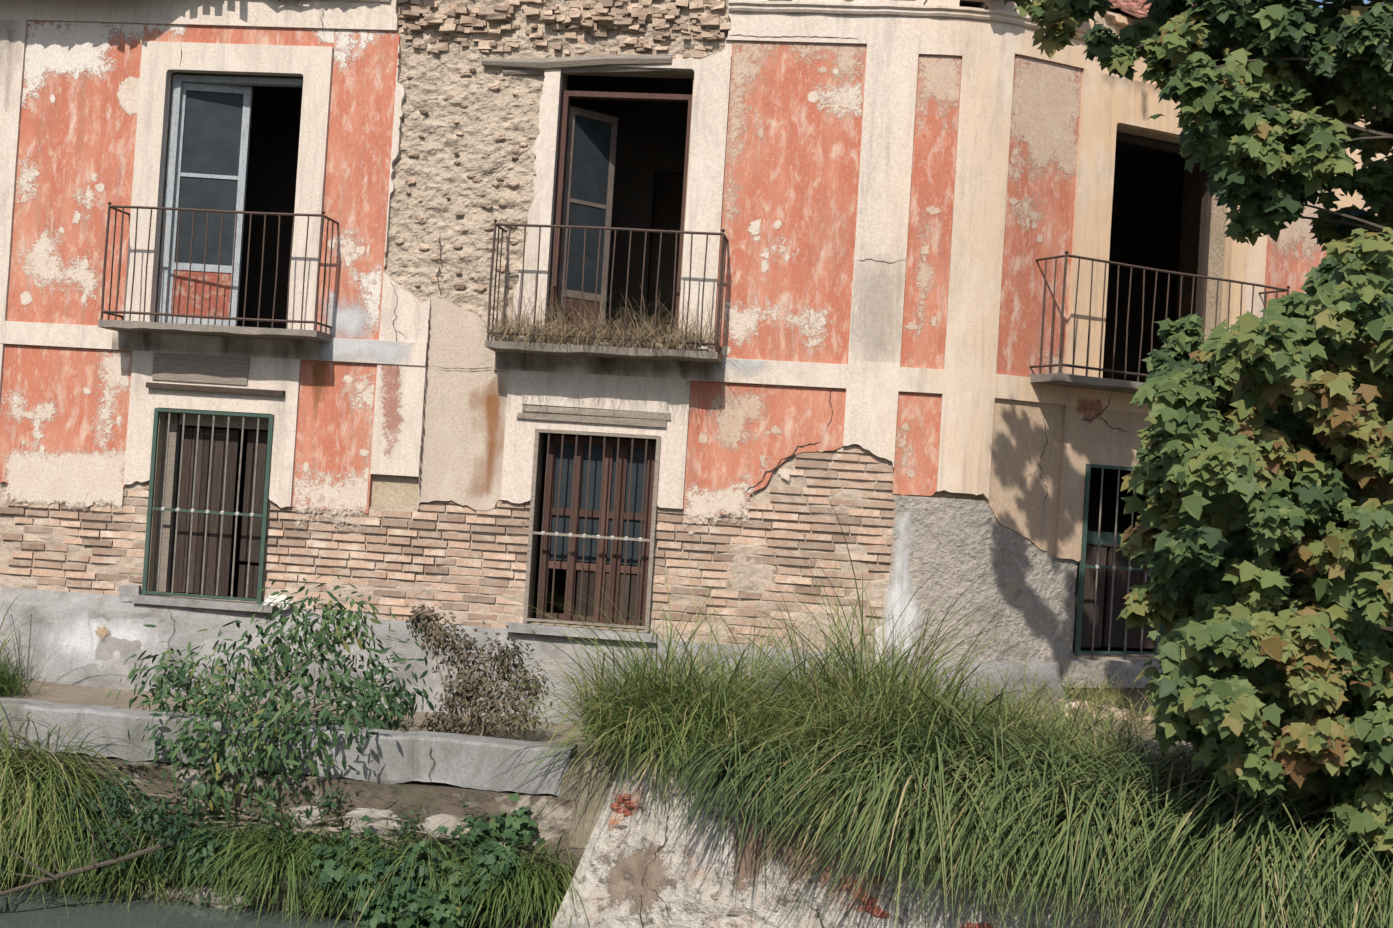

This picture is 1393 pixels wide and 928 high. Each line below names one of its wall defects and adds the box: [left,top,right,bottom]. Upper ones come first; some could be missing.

peeling [22,21,186,109]
peeling [16,155,46,209]
peeling [15,173,105,309]
flaking render [308,0,866,357]
flaking render [263,369,530,628]
flaking render [650,385,919,656]
crack [746,388,835,492]
flaking render [608,786,644,831]
crack [640,801,673,927]